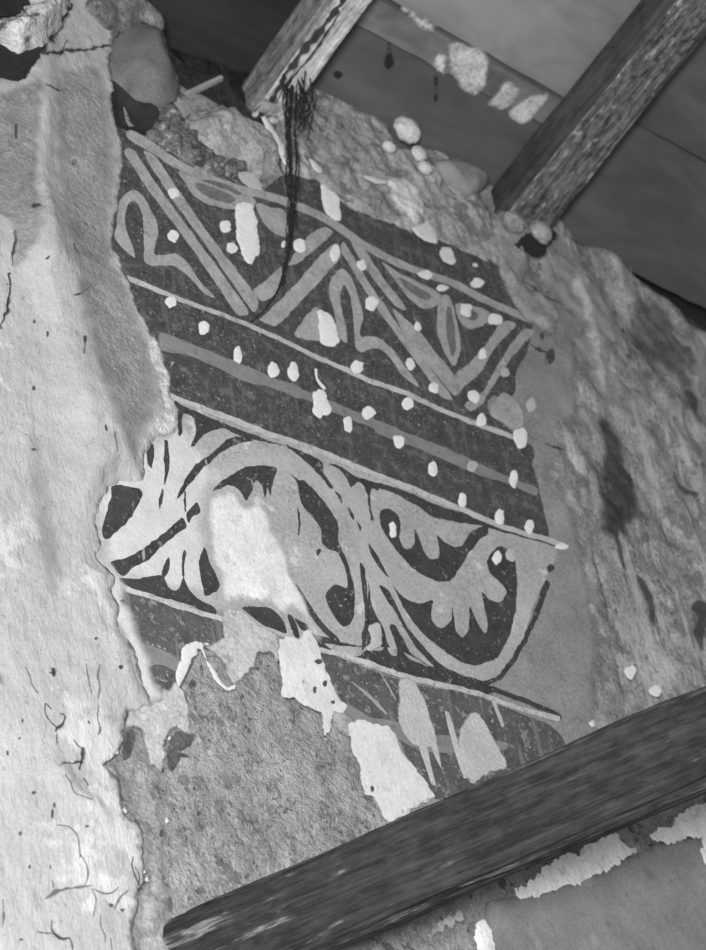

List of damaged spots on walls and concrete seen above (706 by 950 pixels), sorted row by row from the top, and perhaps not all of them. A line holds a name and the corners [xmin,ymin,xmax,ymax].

spalling [112,491,441,950]
peeling [445,711,507,784]
peeling [491,699,504,727]